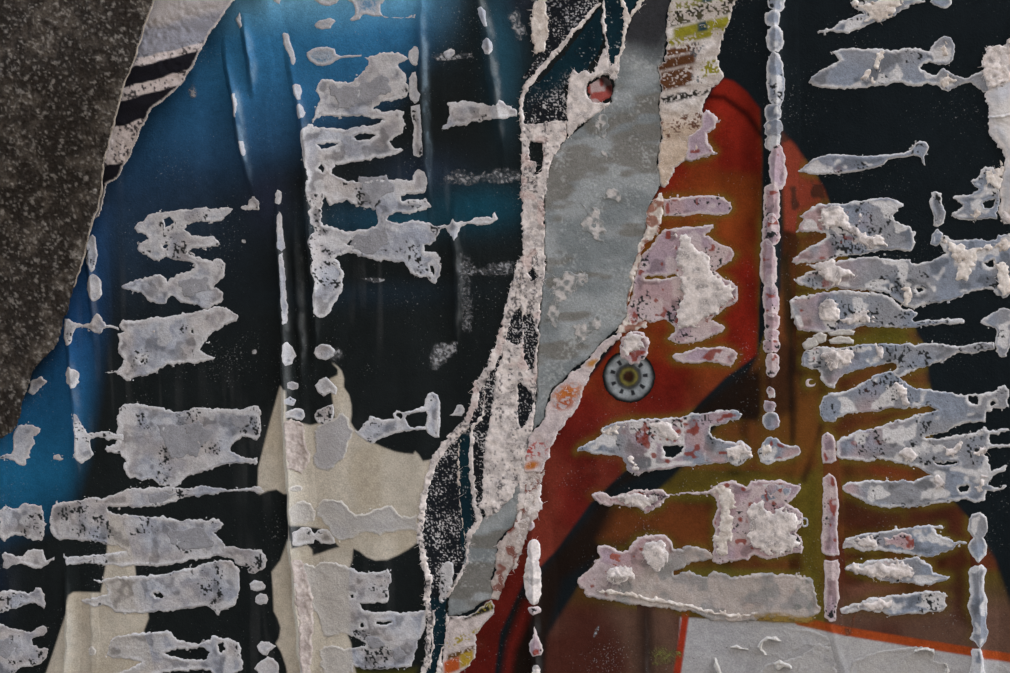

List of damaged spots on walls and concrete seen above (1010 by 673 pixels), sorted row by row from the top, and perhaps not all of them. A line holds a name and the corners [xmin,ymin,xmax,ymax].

peeling [478,7,487,26]
peeling [442,100,517,131]
peeling [64,196,259,381]
peeling [577,0,1010,673]
peeling [28,376,47,395]
peeling [66,367,79,388]
peeling [522,521,542,615]
peeling [529,627,543,673]